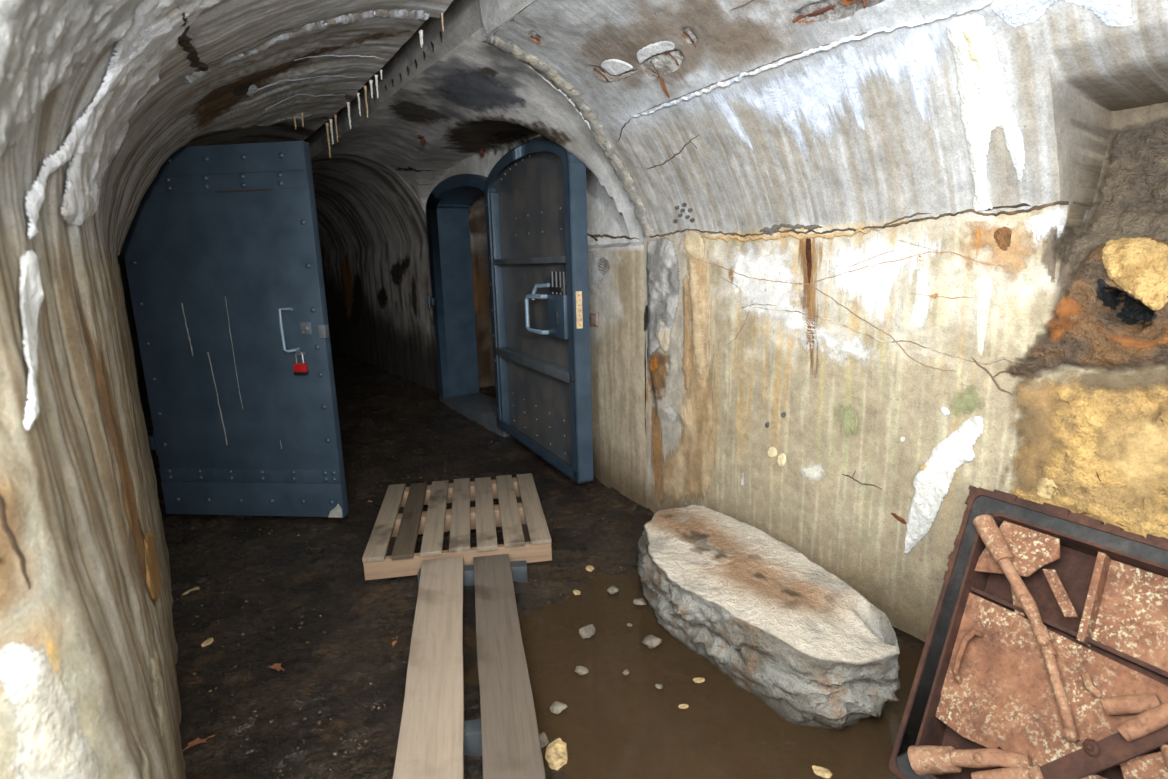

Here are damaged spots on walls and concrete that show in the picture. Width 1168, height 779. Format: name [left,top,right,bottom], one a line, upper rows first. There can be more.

spalling [792,0,883,23]
leakage [990,0,1138,28]
spalling [589,28,697,97]
corrosion [799,238,822,370]
crack [587,201,1099,395]
spalling [963,119,1168,547]
crack [0,495,31,589]